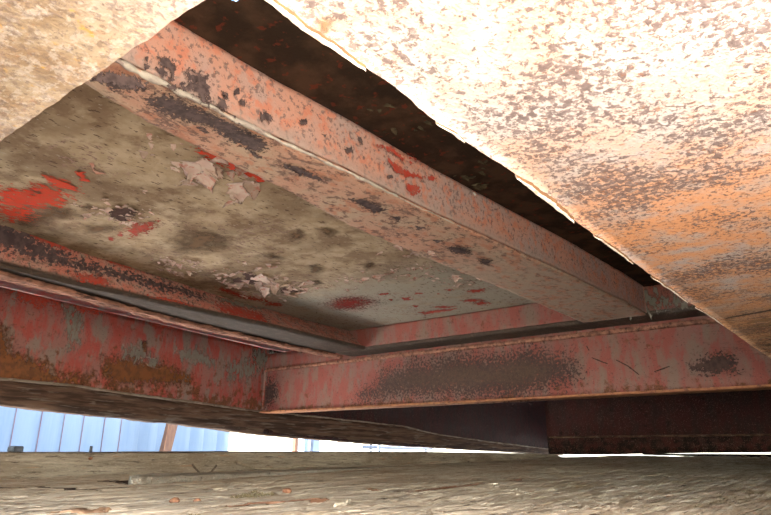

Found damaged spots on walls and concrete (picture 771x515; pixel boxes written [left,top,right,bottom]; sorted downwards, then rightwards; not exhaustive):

rust [90,56,276,159]
peeling [170,157,266,208]
rust [282,161,322,181]
water stain [19,207,79,226]
peeling [68,198,155,228]
rust [348,198,404,222]
peeling [151,257,203,278]
water stain [178,232,224,252]
rust [433,239,493,266]
peeling [210,261,327,310]
rust [0,323,193,391]
rust [685,349,744,381]